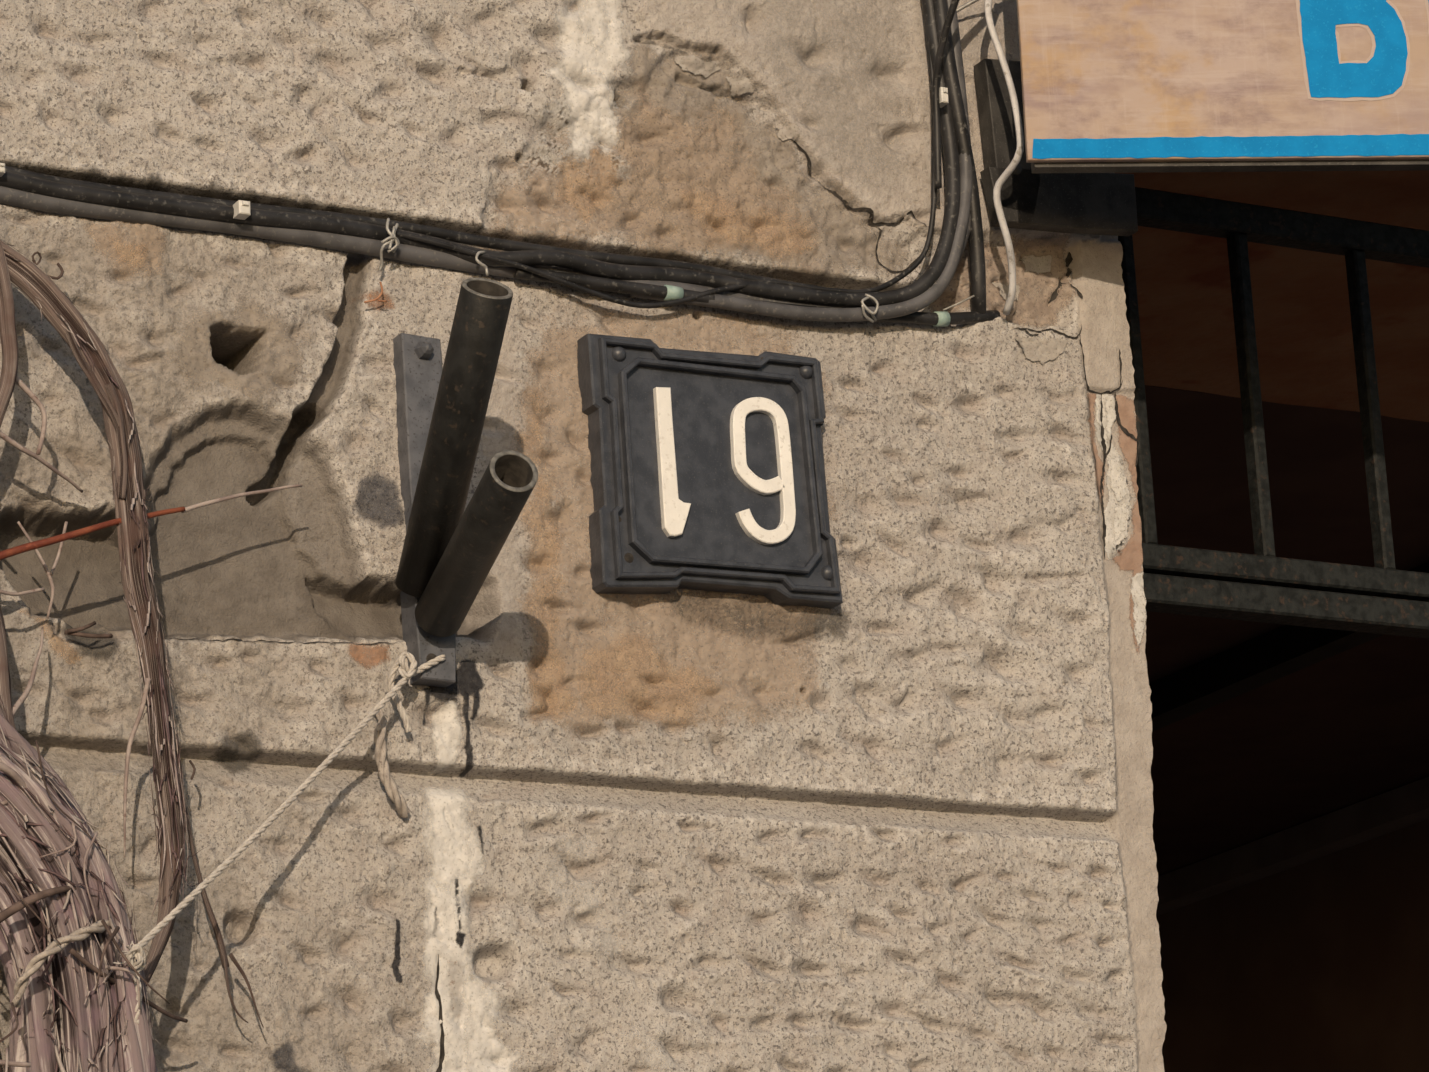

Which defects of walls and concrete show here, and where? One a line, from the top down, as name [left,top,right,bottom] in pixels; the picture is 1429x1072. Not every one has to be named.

water stain [516,0,631,182]
spalling [543,40,905,287]
crack [794,141,927,273]
spalling [175,303,299,396]
crack [1014,252,1140,557]
flaking render [1088,391,1147,652]
water stain [417,686,521,1072]
crack [435,954,445,1072]